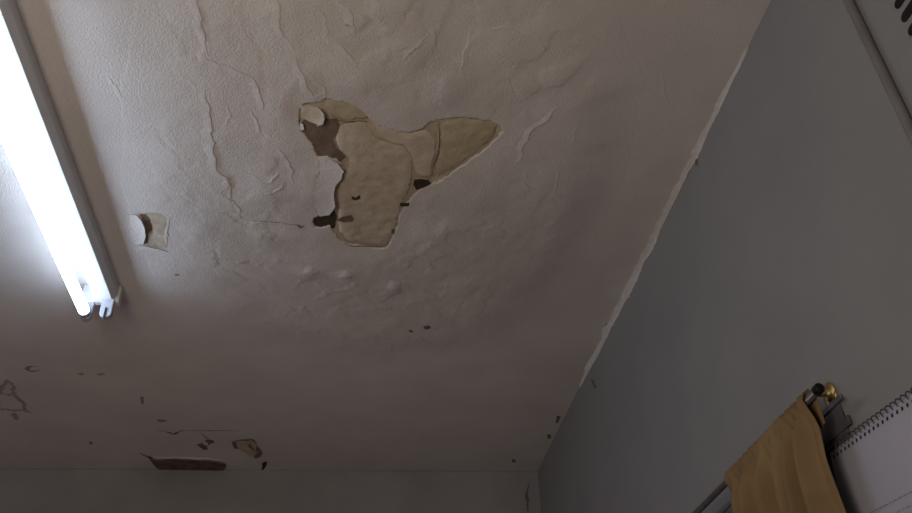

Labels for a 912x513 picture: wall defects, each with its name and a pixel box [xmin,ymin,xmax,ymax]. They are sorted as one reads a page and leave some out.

peeling [299,98,503,248]
peeling [130,212,171,253]
spalling [140,433,226,471]
peeling [232,439,267,470]